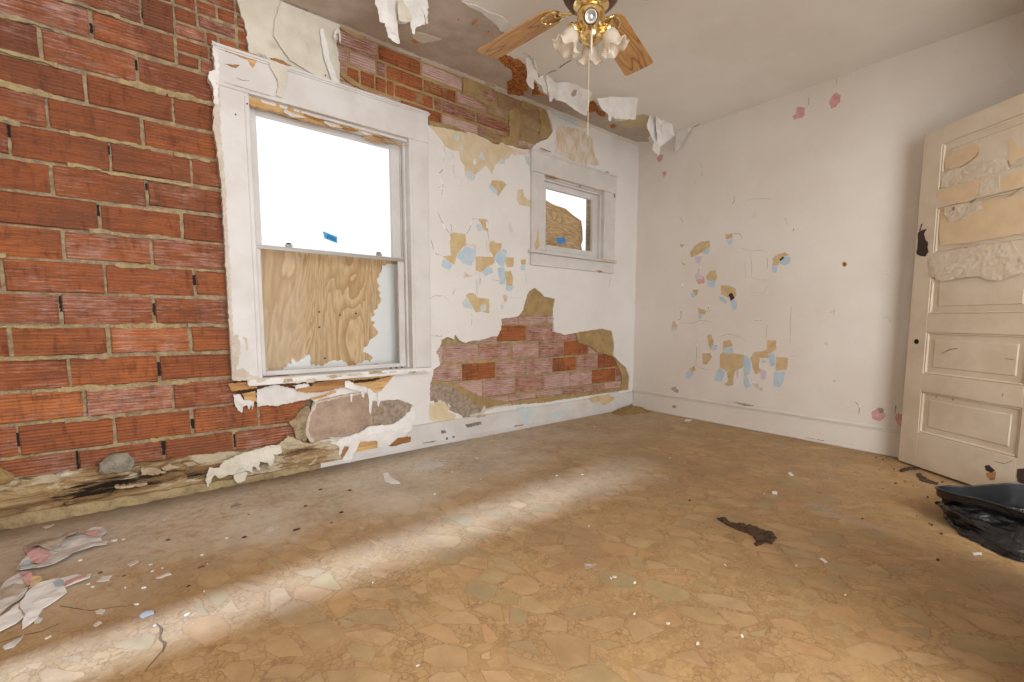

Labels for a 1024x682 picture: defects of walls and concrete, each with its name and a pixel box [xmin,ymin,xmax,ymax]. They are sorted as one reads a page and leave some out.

flaking render [0,0,629,486]
peeling [680,240,737,318]
peeling [772,252,791,273]
peeling [671,334,788,408]